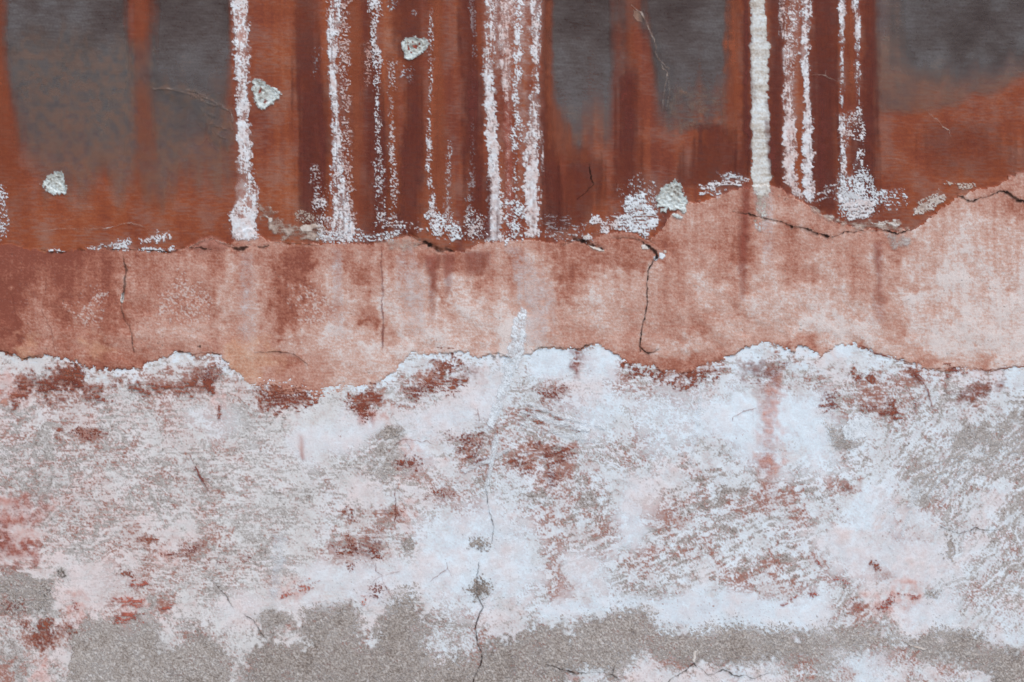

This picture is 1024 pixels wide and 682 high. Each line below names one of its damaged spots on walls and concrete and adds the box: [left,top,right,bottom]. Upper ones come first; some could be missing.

rust [845,0,854,46]
rust [389,69,398,194]
rust [430,0,445,228]
water stain [296,0,659,331]
crack [744,213,855,237]
water stain [641,0,1024,230]
crack [959,190,1024,202]
crack [573,238,658,354]
peeling [10,363,223,419]
peeling [620,362,720,391]
flaking render [0,569,234,682]
flaking render [246,582,1024,682]